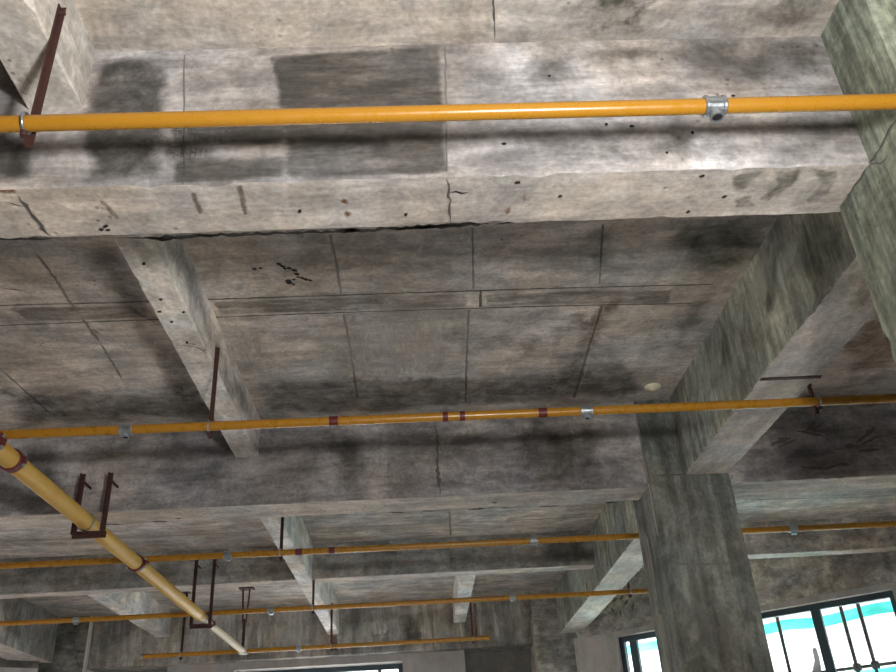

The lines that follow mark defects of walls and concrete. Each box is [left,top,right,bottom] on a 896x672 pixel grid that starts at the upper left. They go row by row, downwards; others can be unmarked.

crack [0,197,122,379]
crack [106,179,514,242]